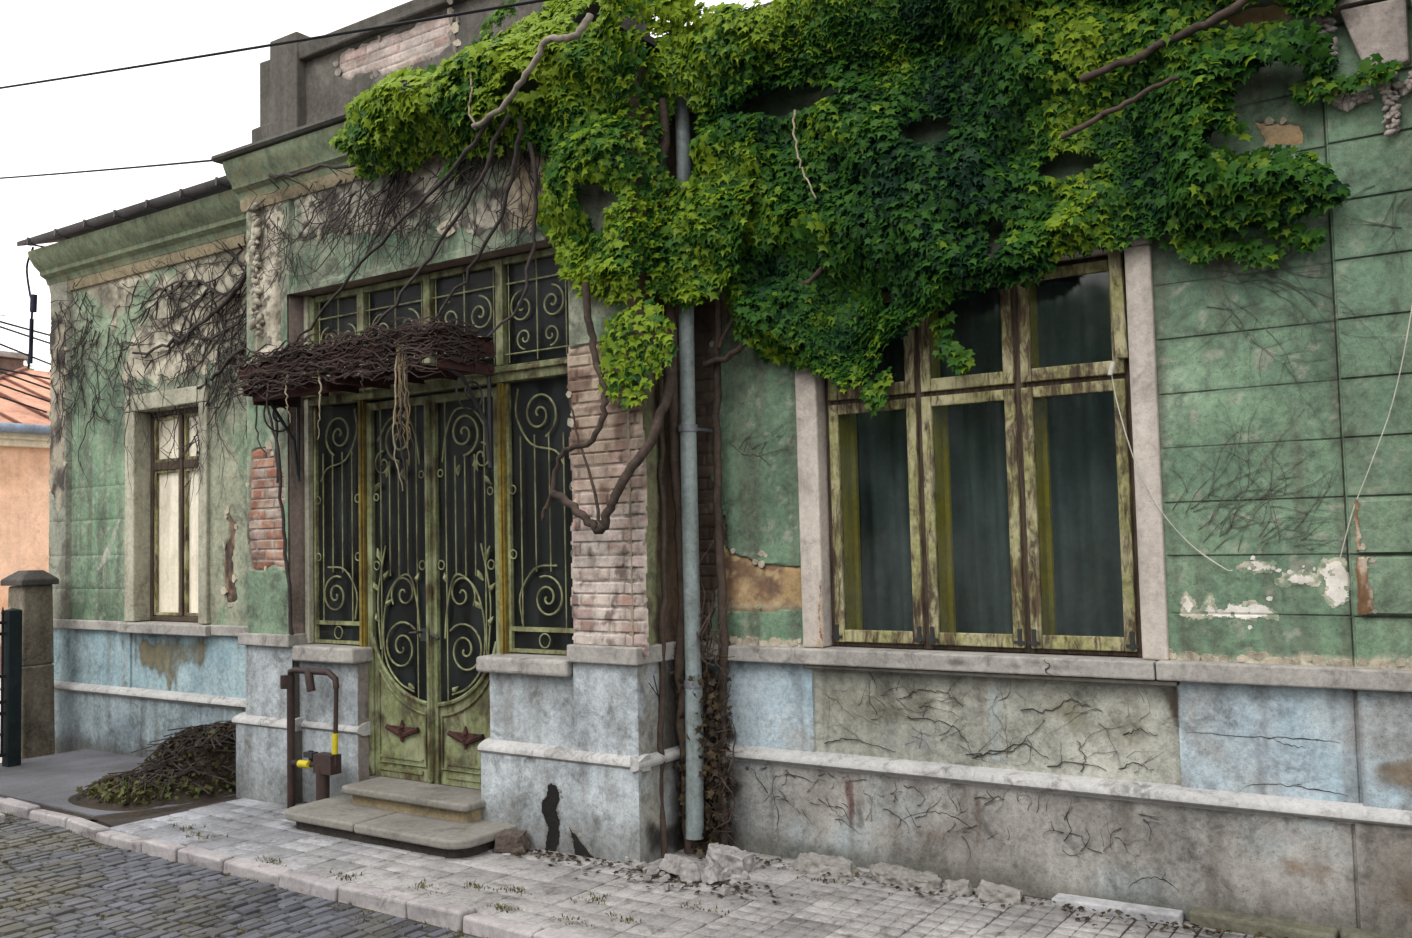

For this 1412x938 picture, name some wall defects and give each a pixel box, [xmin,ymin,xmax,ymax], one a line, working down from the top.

flaking render [333,0,461,80]
flaking render [1255,116,1303,147]
flaking render [47,131,549,513]
flaking render [694,284,824,647]
flaking render [221,441,289,607]
peeling [1180,499,1378,630]
water stain [135,639,204,690]
flaking render [1169,648,1412,670]
spalling [542,783,594,858]
crack [903,798,978,833]